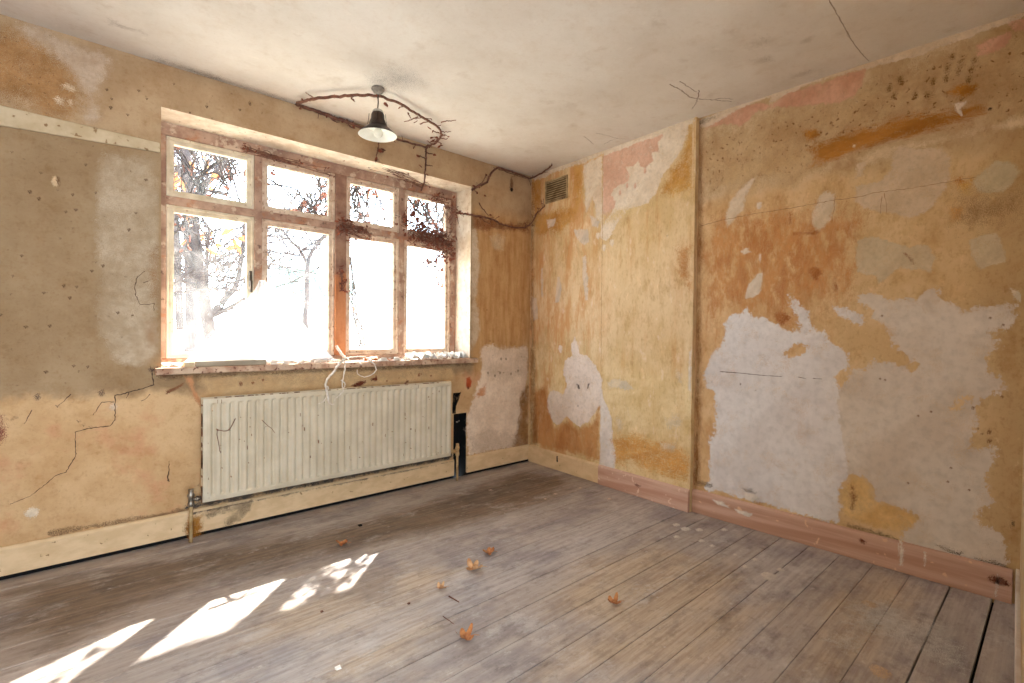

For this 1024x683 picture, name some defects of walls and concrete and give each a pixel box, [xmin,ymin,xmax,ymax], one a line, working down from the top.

crack [669,81,732,108]
crack [829,0,869,61]
flaking render [583,120,690,251]
peeling [725,176,762,226]
peeling [811,190,837,233]
crack [11,367,157,504]
flaking render [452,228,529,456]
flaking render [547,337,632,469]
flaking render [688,247,851,524]
flaking render [832,306,865,326]